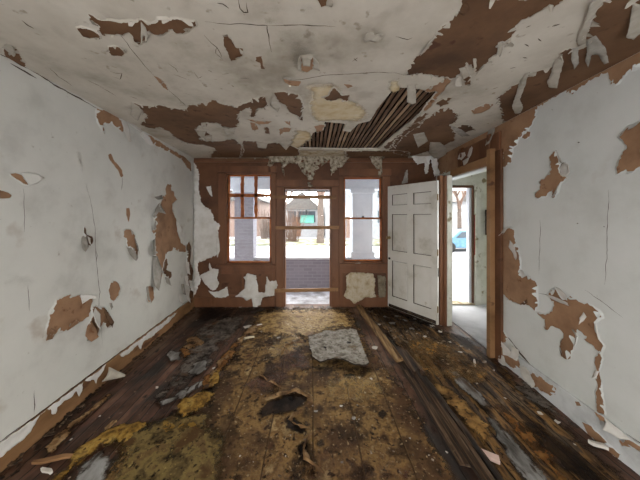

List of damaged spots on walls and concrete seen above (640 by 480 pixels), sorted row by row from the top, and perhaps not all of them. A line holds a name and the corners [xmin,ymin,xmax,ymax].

peeling [75,12,198,66]
peeling [95,0,640,307]
peeling [43,280,122,342]
peeling [498,226,640,460]